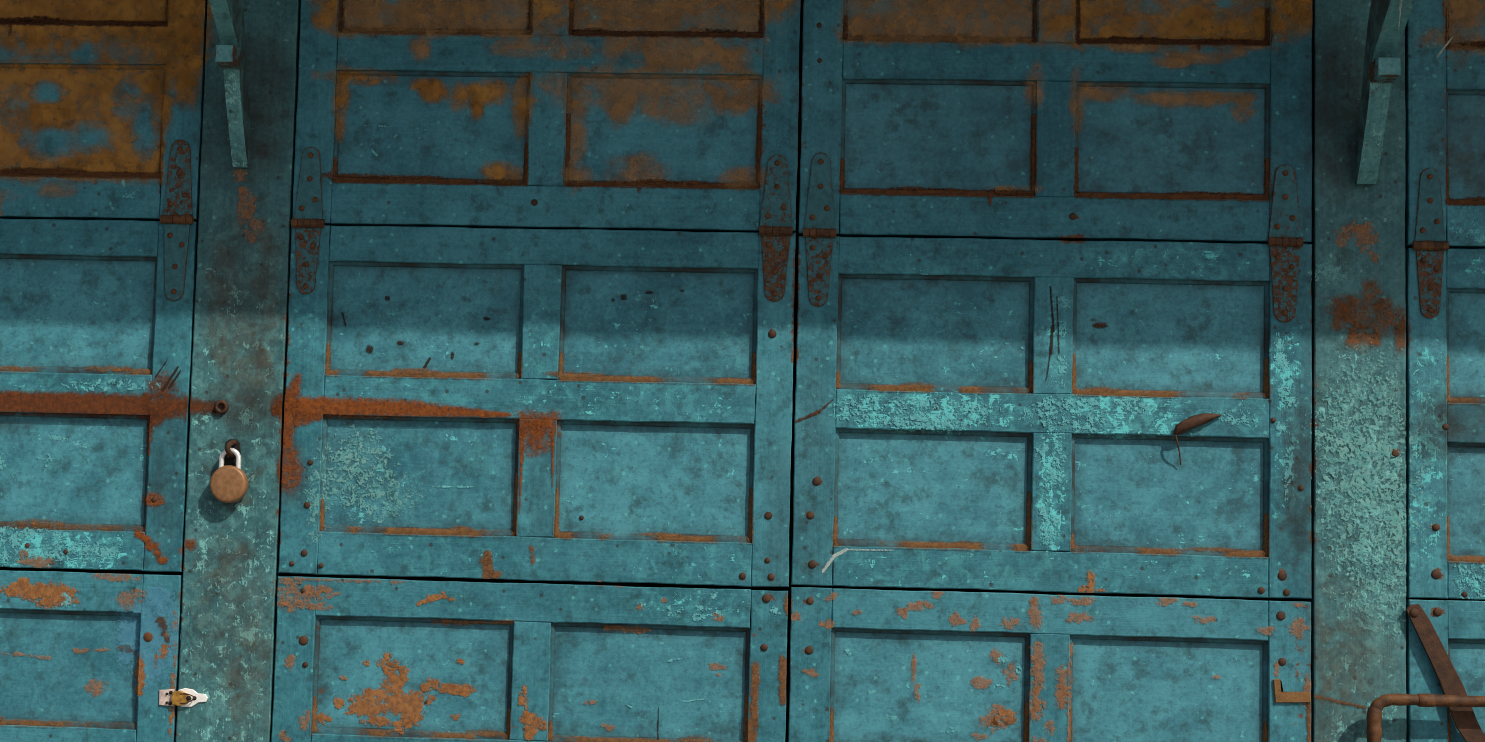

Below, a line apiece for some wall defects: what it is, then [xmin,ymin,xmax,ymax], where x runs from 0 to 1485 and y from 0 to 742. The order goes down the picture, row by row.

corrosion [0,0,170,36]
corrosion [568,0,765,39]
corrosion [1075,0,1273,50]
corrosion [0,124,163,179]
corrosion [323,143,529,186]
corrosion [563,93,763,193]
corrosion [0,366,219,456]
peeling [833,394,1001,434]
peeling [1018,296,1155,548]
peeling [1210,408,1256,426]
peeling [1454,564,1485,599]
corrosion [411,708,511,741]